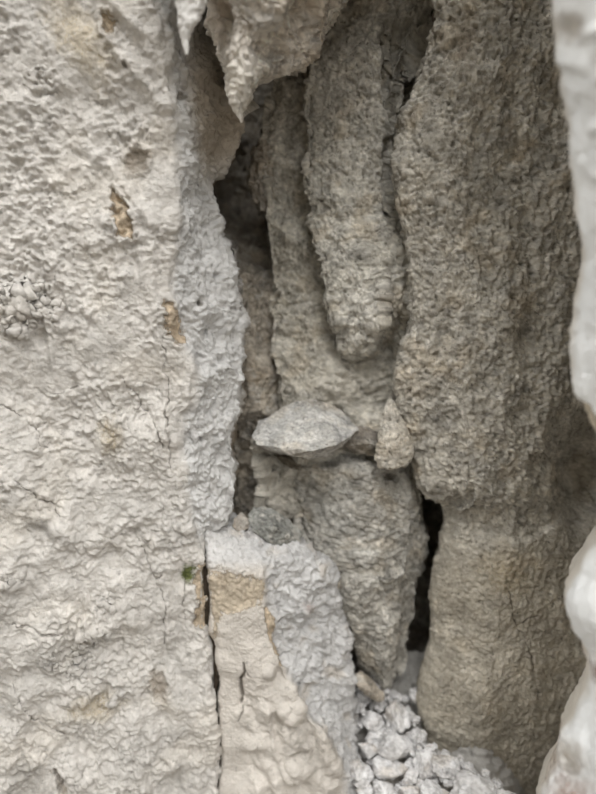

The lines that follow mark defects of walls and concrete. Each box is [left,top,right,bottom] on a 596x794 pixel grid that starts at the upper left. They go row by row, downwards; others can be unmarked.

spalling [110,188,133,238]
spalling [161,299,186,346]
crack [203,557,222,787]